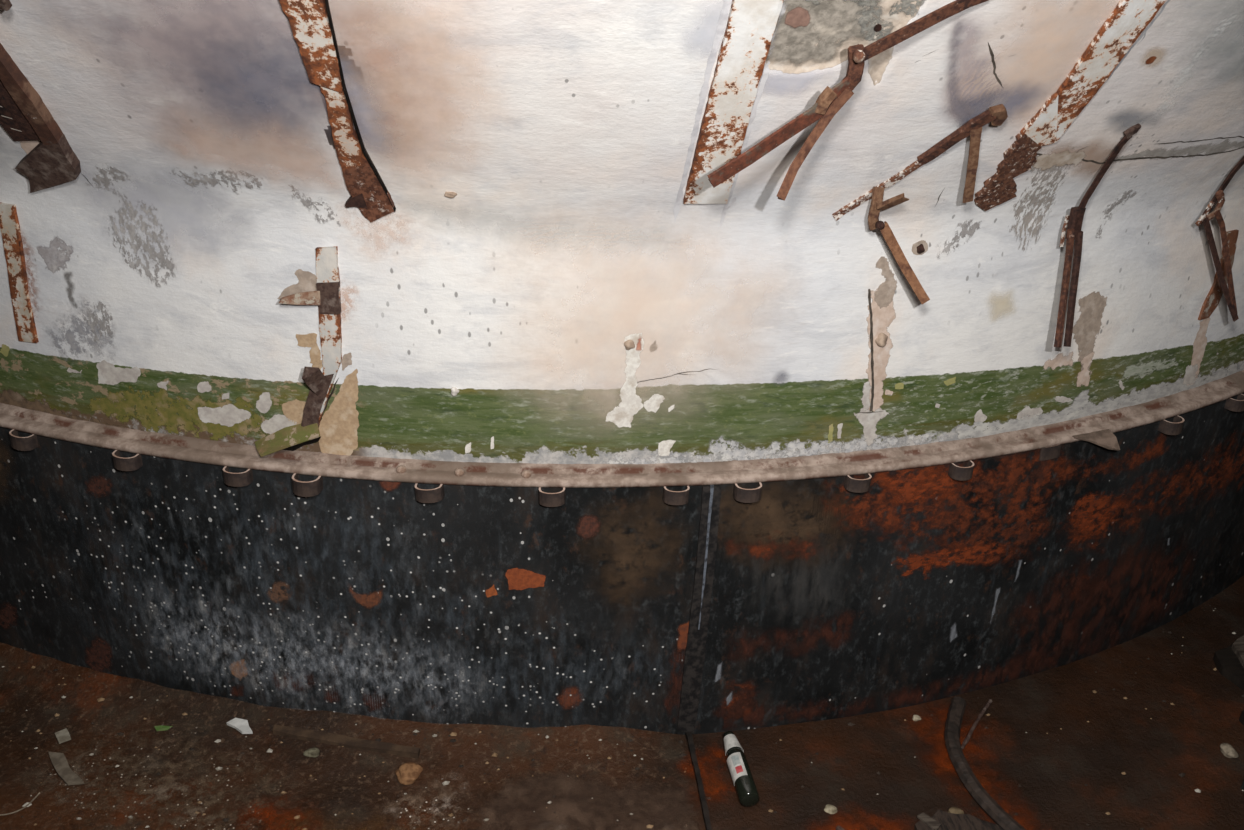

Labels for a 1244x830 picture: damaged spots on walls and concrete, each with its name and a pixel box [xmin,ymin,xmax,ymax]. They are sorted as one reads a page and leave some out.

corrosion [344,21,448,165]
flaking render [766,0,925,85]
corrosion [1146,50,1162,65]
crack [1033,136,1244,171]
peeling [93,166,174,287]
peeling [0,360,306,441]
peeling [296,333,323,370]
peeling [319,352,360,456]
peeling [606,256,1244,464]
corrosion [828,433,1165,576]
corrosion [1071,440,1244,548]
efflorescence [91,489,608,724]